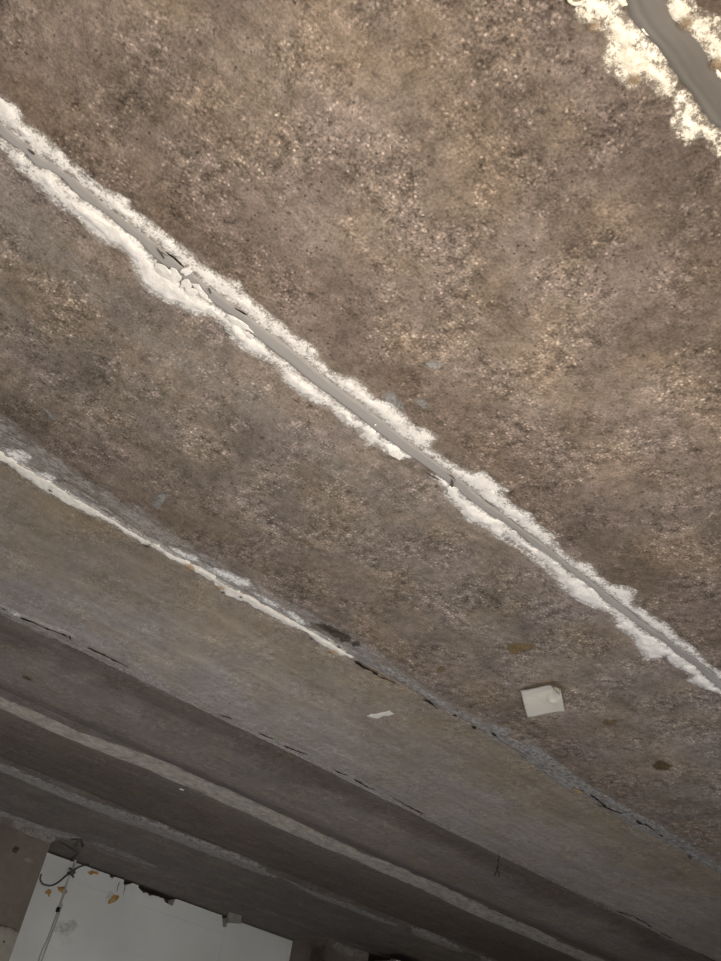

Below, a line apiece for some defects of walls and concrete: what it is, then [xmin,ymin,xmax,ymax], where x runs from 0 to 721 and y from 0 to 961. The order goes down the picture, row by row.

damp [575,0,721,156]
crack [157,248,185,268]
damp [0,98,721,694]
crack [426,472,455,487]
crack [3,609,126,667]
crack [355,661,396,684]
crack [423,699,497,737]